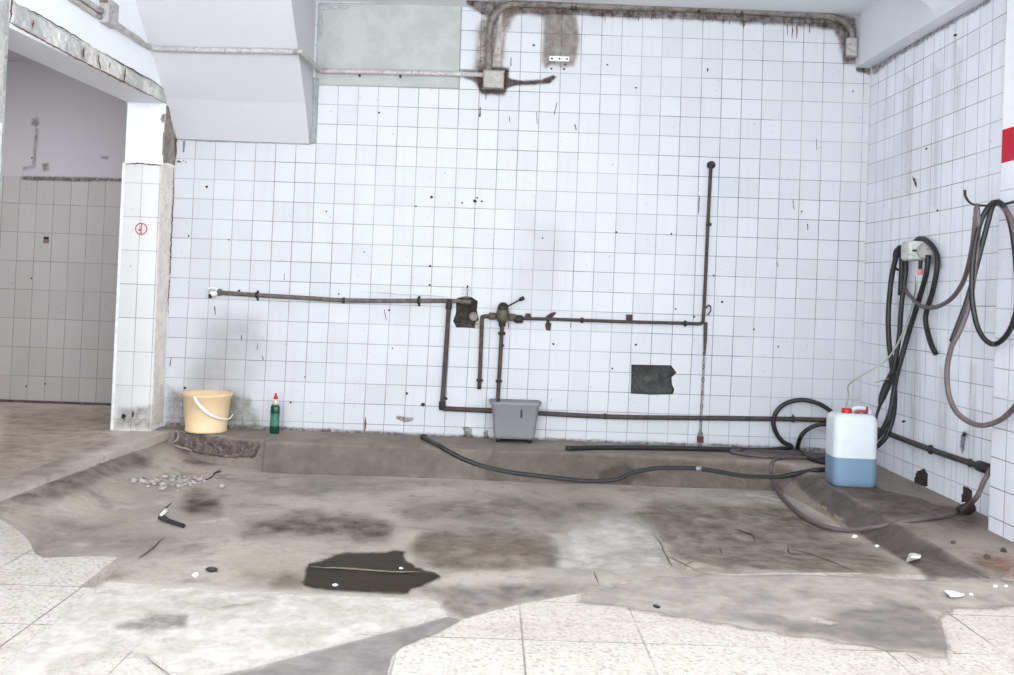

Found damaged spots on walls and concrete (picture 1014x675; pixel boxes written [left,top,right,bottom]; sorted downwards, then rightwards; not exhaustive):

spalling [0,0,177,165]
water stain [544,15,578,66]